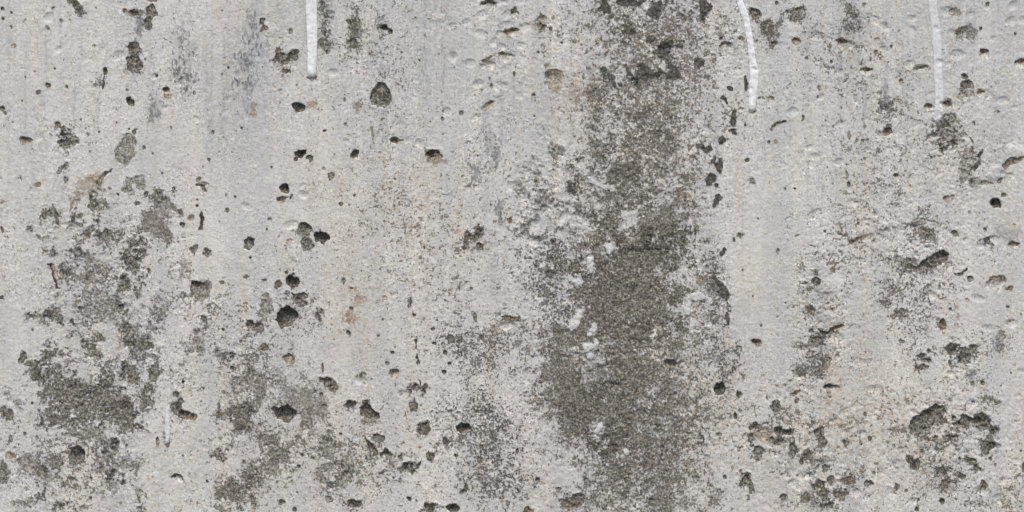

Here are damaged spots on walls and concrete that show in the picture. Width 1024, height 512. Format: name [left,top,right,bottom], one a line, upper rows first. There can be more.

water stain [427,0,746,512]